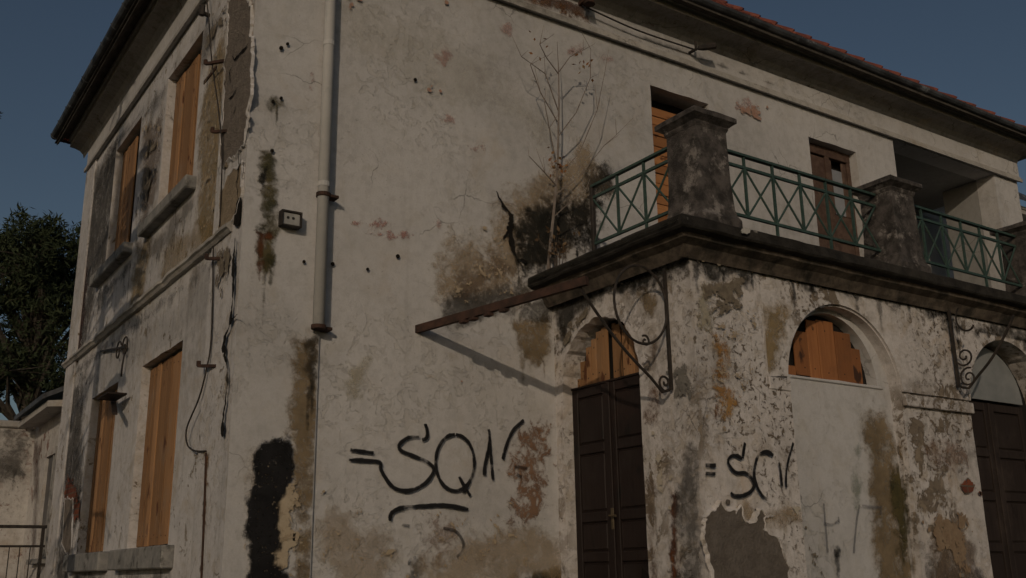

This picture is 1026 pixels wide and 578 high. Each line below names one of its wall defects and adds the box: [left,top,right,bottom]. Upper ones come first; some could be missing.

flaking render [204,0,255,241]
damp [81,140,120,345]
damp [256,151,280,283]
damp [439,145,756,419]
flaking render [62,474,80,555]
peeling [271,476,306,577]
damp [288,338,318,578]
damp [507,422,557,526]
flaking render [700,499,792,578]
damp [863,410,915,578]
peeling [922,506,978,577]
spalling [961,472,982,496]